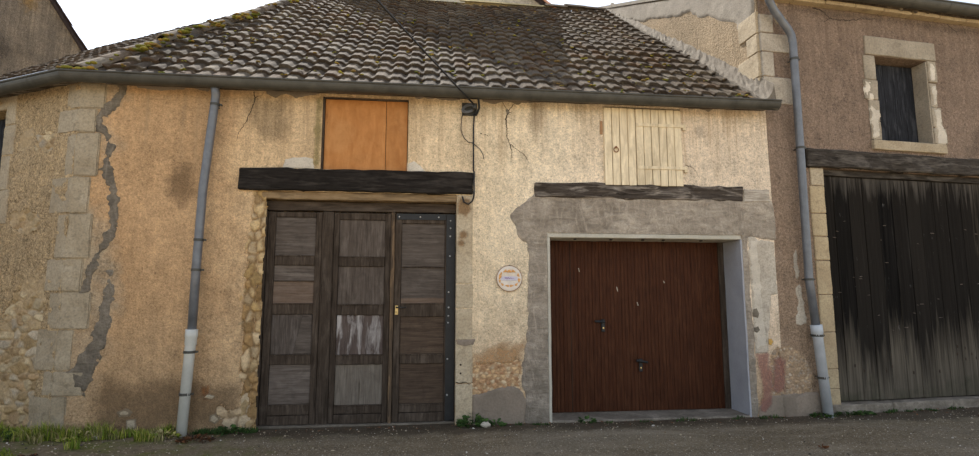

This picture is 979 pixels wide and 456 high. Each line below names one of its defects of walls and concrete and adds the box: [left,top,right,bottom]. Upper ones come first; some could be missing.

crack [503,103,529,163]
peeling [863,82,881,138]
spalling [748,240,814,412]
spalling [471,359,522,394]